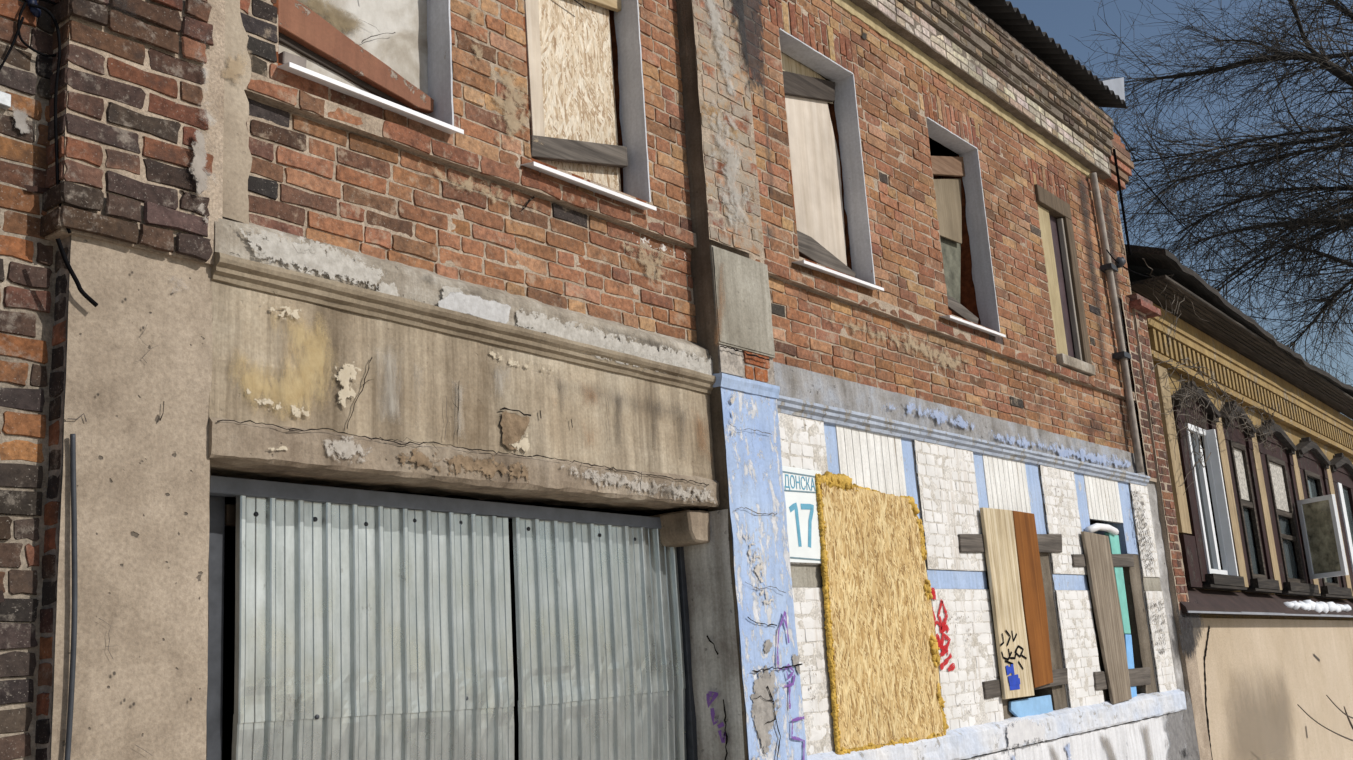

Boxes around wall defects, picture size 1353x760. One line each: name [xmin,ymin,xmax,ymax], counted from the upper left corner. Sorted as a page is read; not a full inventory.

leakage [707,0,735,95]
leakage [711,103,750,230]
peeling [240,228,399,296]
peeling [239,302,362,417]
peeling [438,286,713,375]
peeling [324,436,372,462]
crack [217,357,709,497]
spalling [397,407,531,484]
peeling [561,465,716,504]
crack [746,582,786,626]
crack [723,663,802,760]